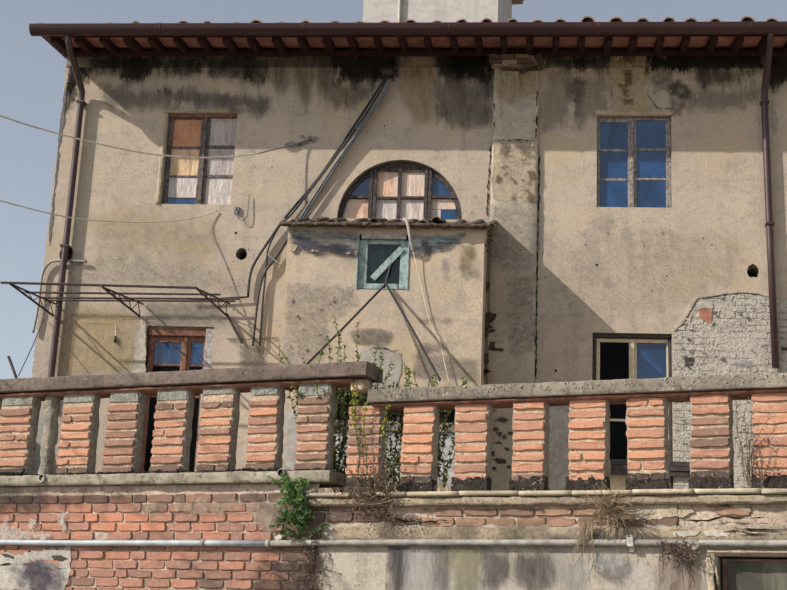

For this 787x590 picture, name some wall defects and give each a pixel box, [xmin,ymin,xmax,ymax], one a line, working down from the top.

water stain [64,56,308,114]
water stain [321,48,536,127]
water stain [548,48,787,111]
flaking render [491,87,539,268]
water stain [291,230,359,257]
crack [486,137,541,379]
flaking render [672,289,787,377]
flaking render [673,402,691,462]
flaking render [732,400,754,488]
flaking render [598,505,695,520]
water stain [385,546,551,590]
crack [708,553,718,590]